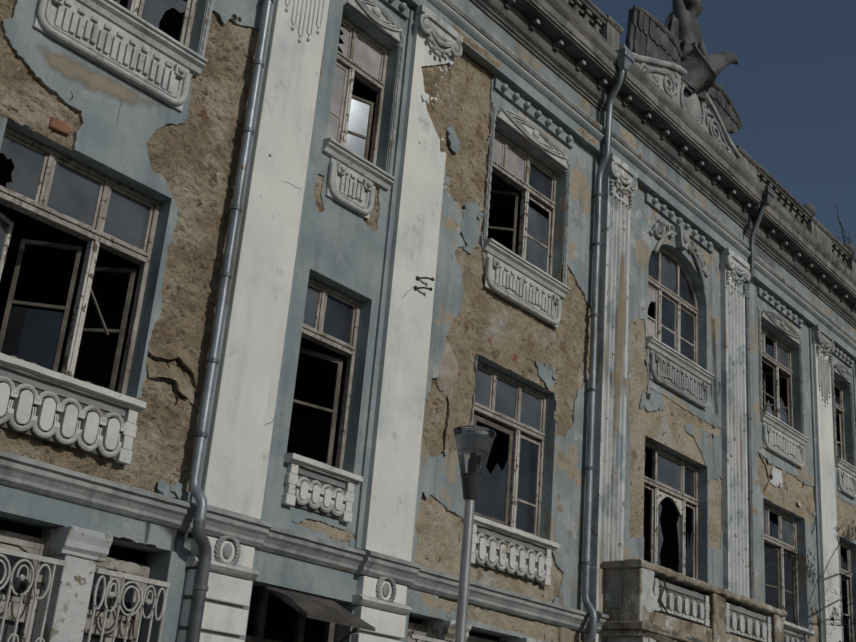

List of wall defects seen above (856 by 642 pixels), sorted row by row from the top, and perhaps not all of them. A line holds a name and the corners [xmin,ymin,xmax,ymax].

peeling [219,13,241,25]
peeling [446,125,460,154]
peeling [460,202,484,254]
crack [147,338,204,407]
peeling [758,457,783,487]
crack [758,452,788,491]
peeling [156,478,184,500]